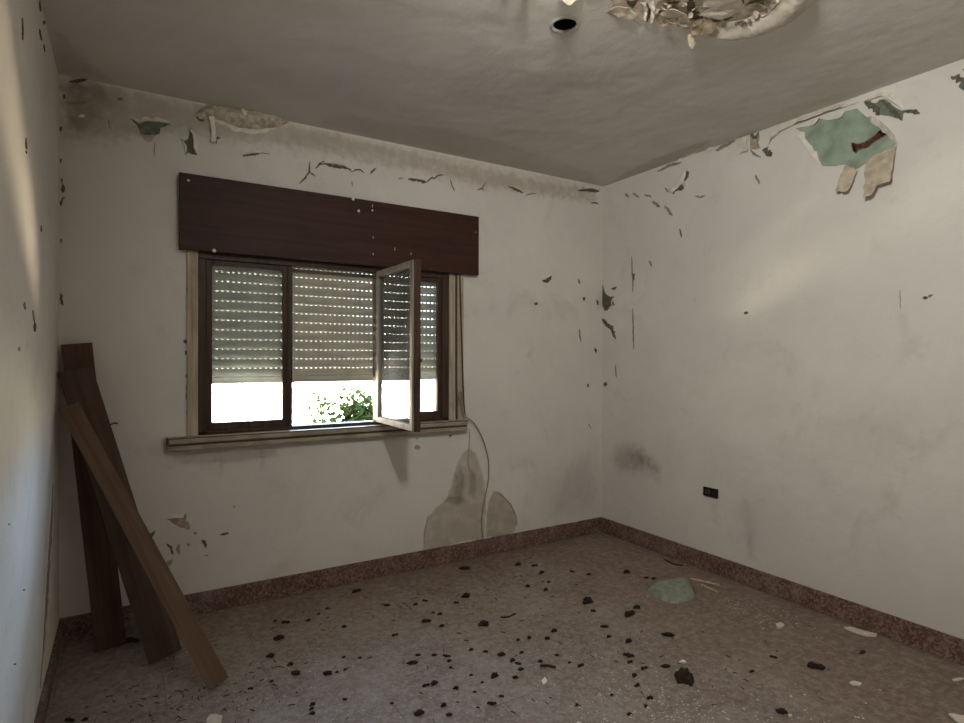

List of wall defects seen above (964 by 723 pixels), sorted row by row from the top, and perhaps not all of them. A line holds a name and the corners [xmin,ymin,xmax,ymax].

spalling [553,19,576,30]
peeling [606,0,814,49]
peeling [951,69,964,90]
peeling [129,117,174,157]
peeling [180,128,198,155]
peeling [771,90,906,197]
peeling [166,512,208,567]